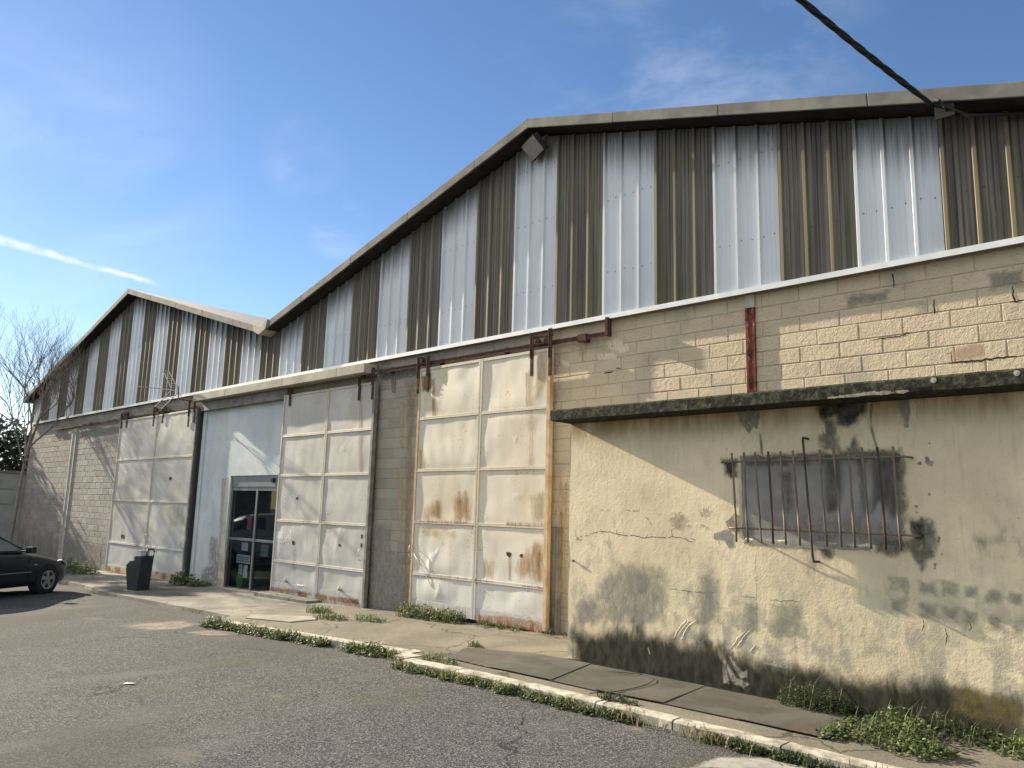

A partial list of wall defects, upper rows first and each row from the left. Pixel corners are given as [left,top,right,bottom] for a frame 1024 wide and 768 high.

corrosion [399,374,434,598]
corrosion [426,491,469,524]
crack [578,510,695,542]
damp [723,399,943,570]
corrosion [509,545,542,589]
corrosion [475,614,542,633]